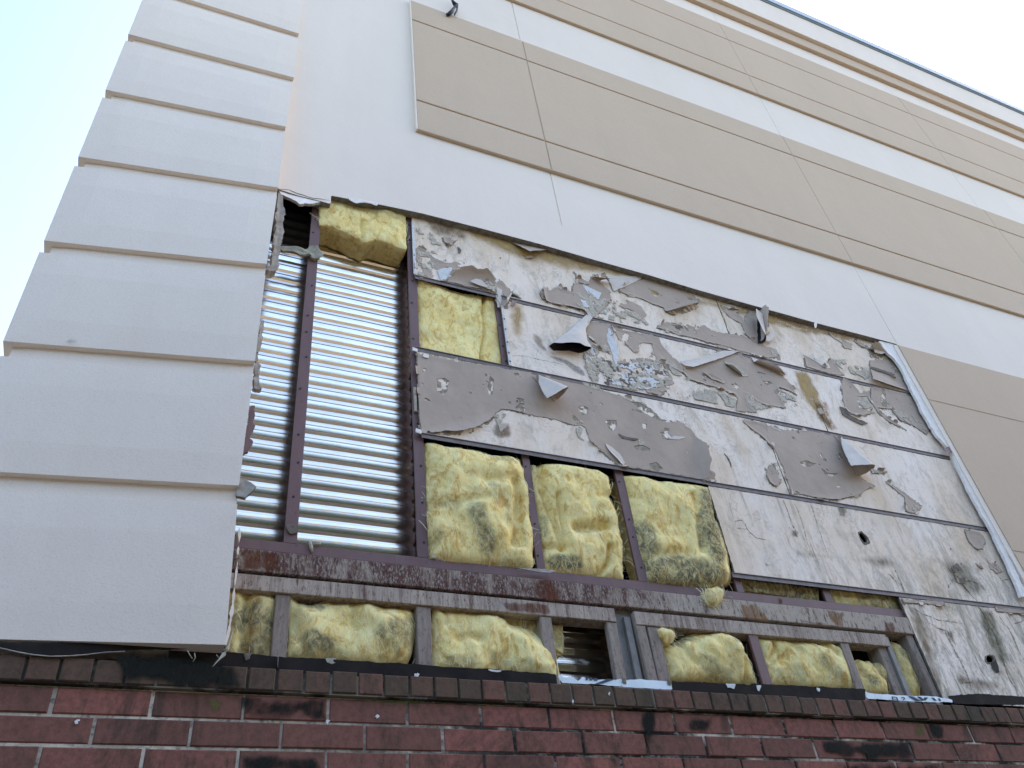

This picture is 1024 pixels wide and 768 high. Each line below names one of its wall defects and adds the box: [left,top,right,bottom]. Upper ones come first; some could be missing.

spalling [266,191,321,279]
spalling [434,283,486,296]
spalling [243,320,264,456]
damp [797,372,832,429]
spalling [236,478,256,500]
spalling [424,438,988,532]
rust [507,581,558,613]
spalling [851,650,870,662]
spalling [913,636,1024,709]